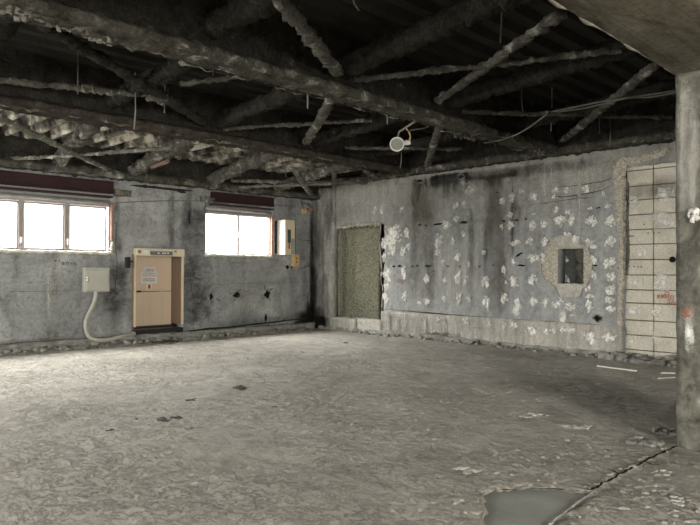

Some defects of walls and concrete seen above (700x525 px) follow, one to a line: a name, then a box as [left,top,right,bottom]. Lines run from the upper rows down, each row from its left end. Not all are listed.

peeling [0,5,75,33]
peeling [82,30,119,47]
spalling [528,148,670,326]
crack [481,446,679,496]